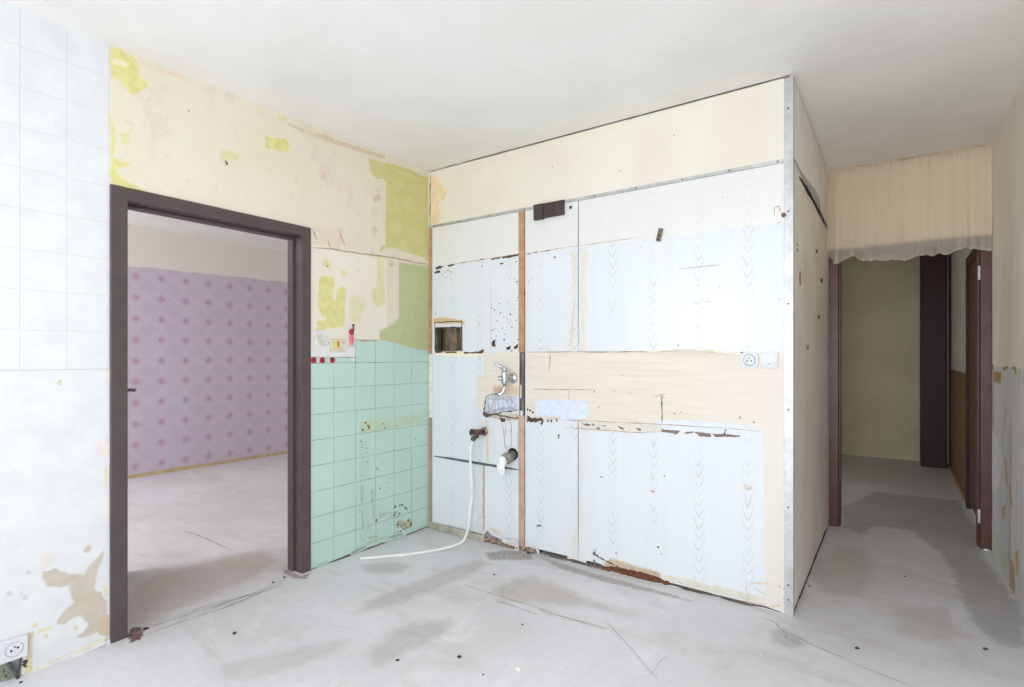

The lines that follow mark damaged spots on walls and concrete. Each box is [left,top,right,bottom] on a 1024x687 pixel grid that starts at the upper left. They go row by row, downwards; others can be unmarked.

peeling [106,43,188,99]
peeling [105,109,148,192]
peeling [260,111,450,310]
peeling [311,256,348,332]
peeling [91,435,110,526]
peeling [435,348,784,611]
peeling [0,543,110,682]
leakage [801,489,1024,658]